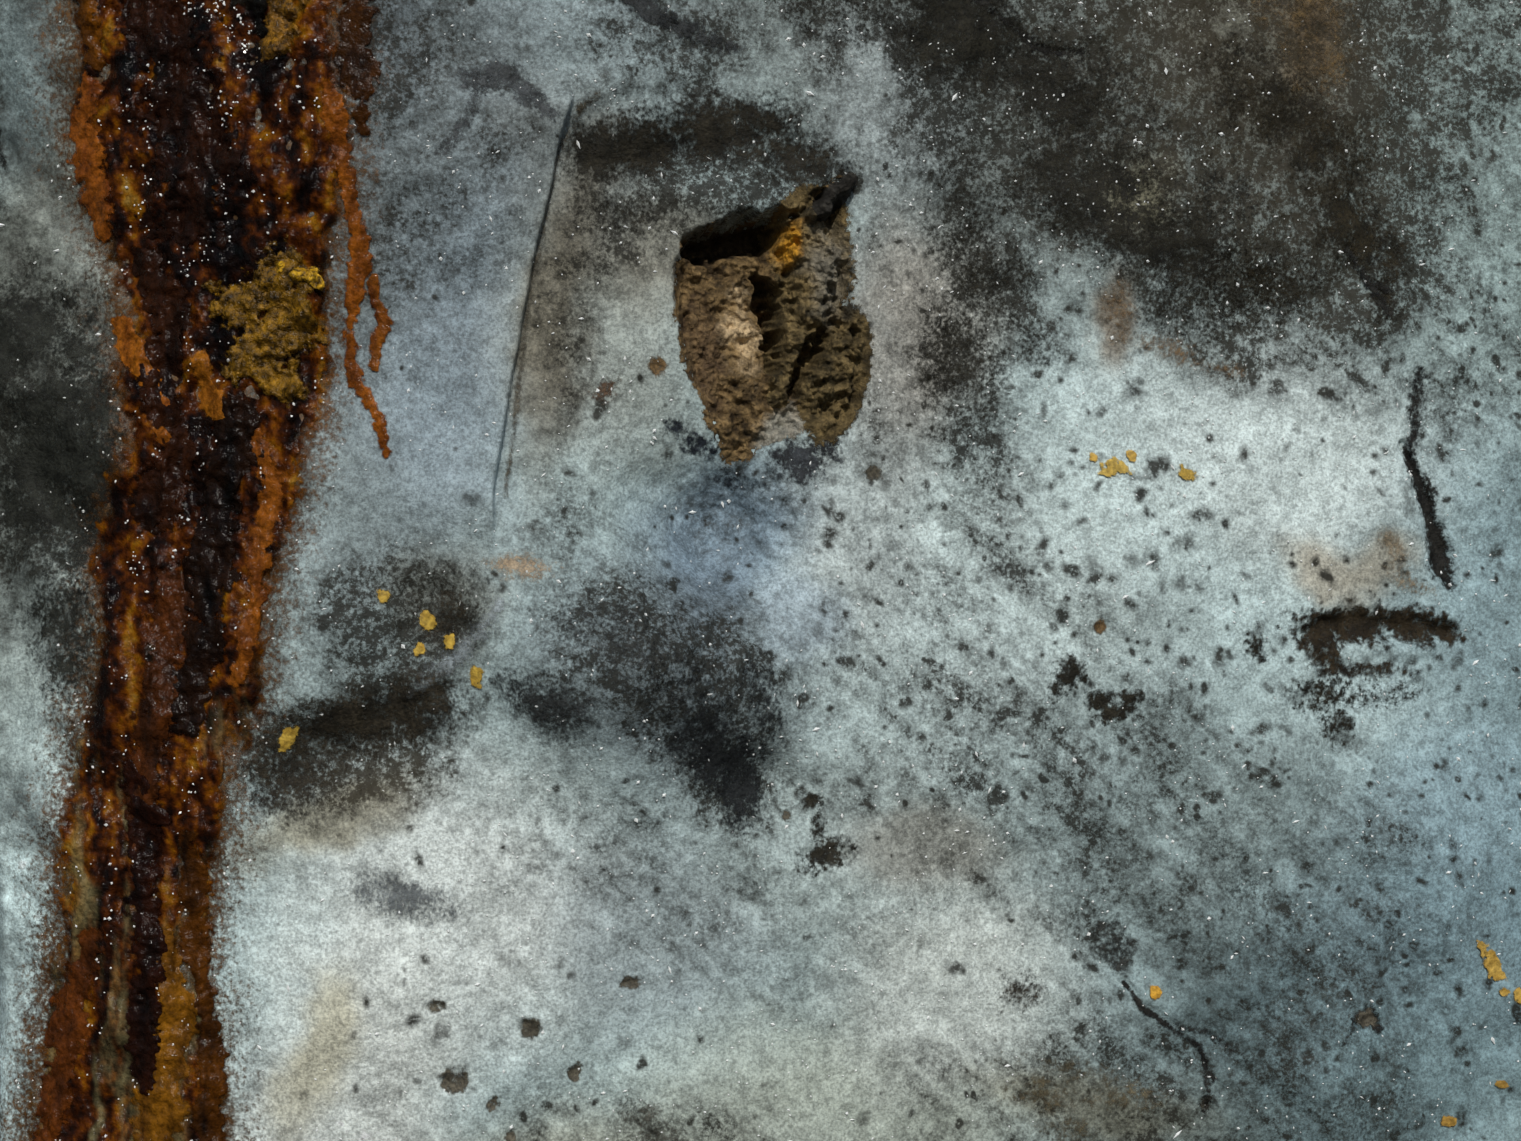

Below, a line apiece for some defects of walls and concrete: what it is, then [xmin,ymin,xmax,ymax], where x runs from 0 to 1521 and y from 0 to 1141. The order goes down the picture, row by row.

damp [558,86,862,239]
spalling [648,172,875,468]
damp [783,0,1418,448]
rust [0,0,394,1141]
crack [1402,366,1456,591]